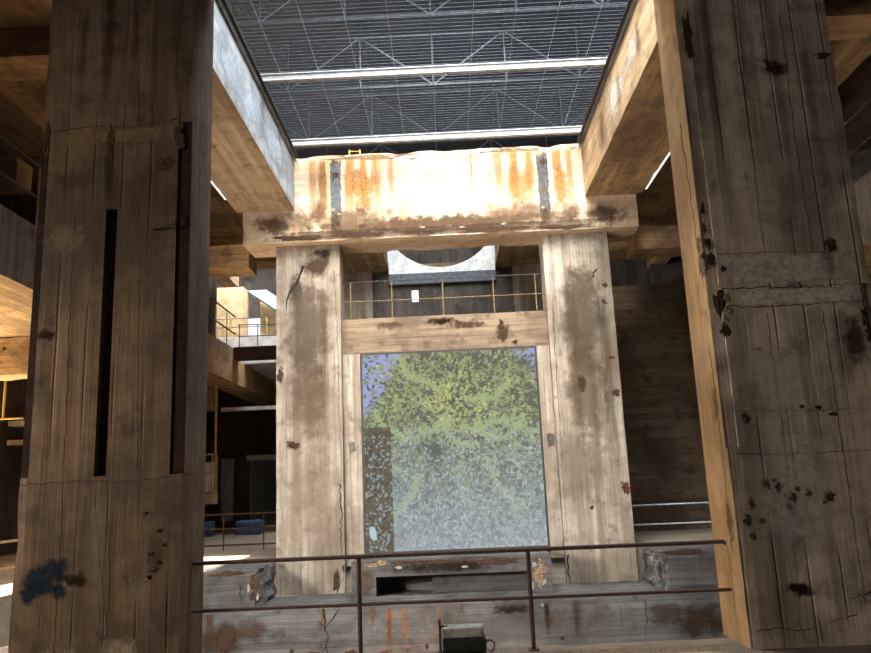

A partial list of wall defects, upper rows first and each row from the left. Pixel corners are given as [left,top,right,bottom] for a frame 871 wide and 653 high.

rust [310,162,326,222]
rust [345,159,392,209]
rust [510,152,533,200]
rust [552,151,567,202]
water stain [257,185,616,375]
water stain [564,269,603,429]
spalling [202,548,729,653]